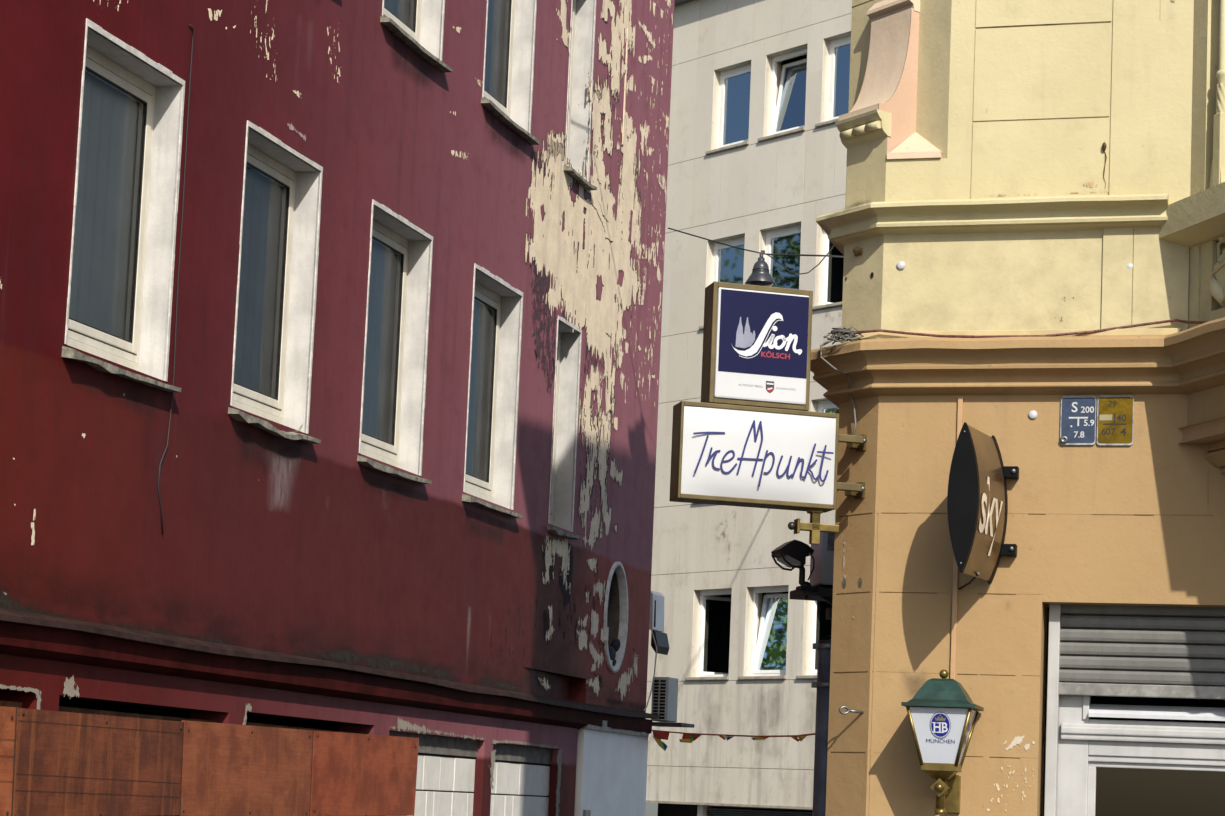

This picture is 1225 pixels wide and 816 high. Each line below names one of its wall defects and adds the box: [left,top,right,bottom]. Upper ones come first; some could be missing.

peeling [250,0,277,80]
peeling [525,0,673,700]